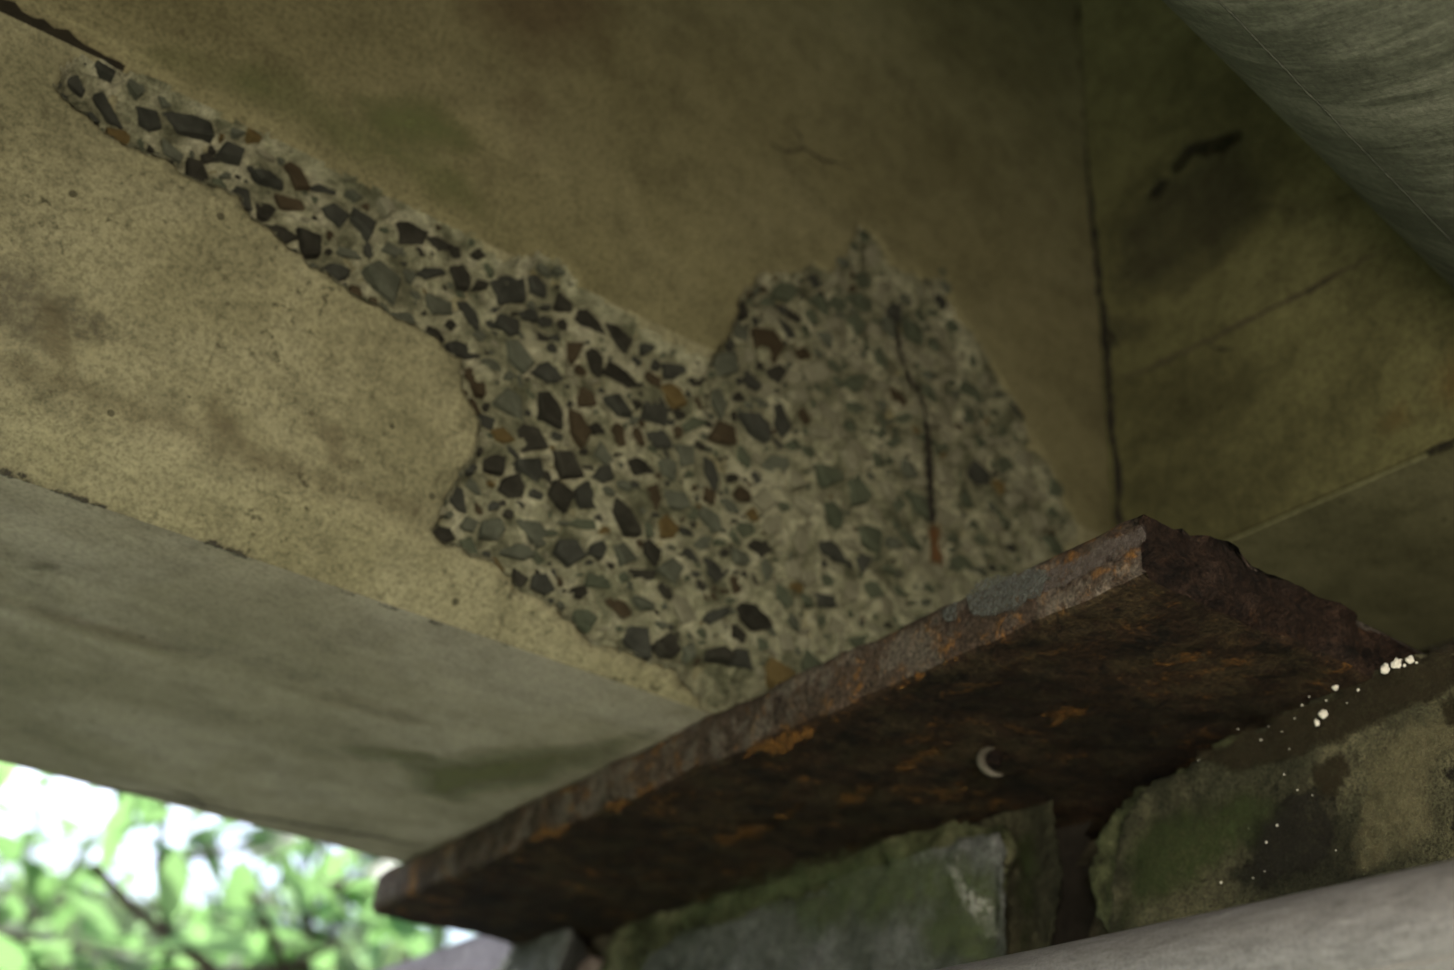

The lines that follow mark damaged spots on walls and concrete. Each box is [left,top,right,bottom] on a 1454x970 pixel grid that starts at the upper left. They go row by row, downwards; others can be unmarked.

spalling [0,468,107,509]
spalling [52,54,1146,714]
crack [1083,110,1389,524]
water stain [1198,645,1454,889]